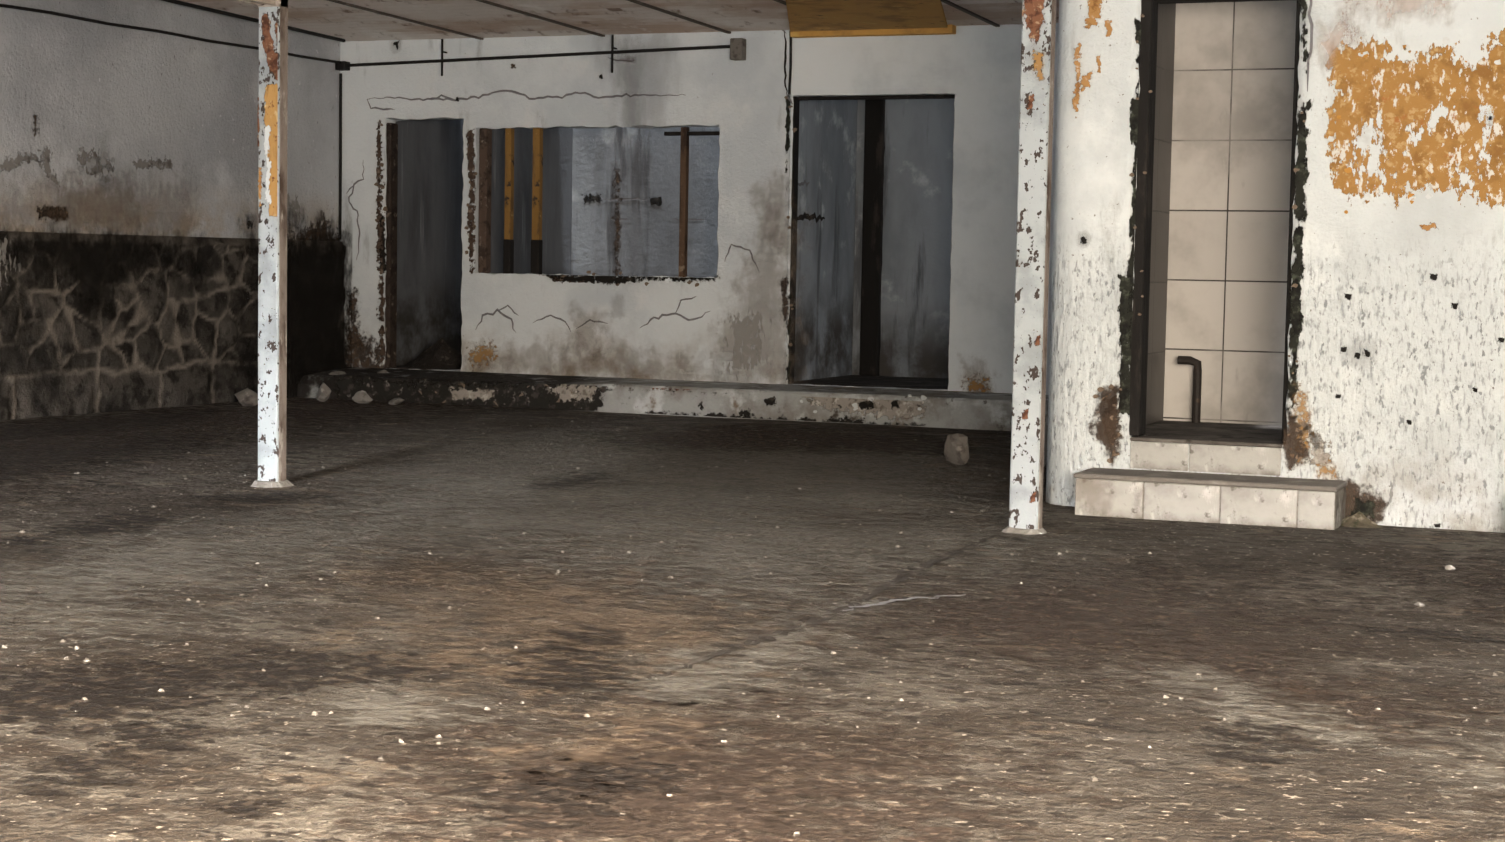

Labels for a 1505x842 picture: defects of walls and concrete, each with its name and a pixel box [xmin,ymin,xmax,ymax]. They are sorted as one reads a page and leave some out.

peeling [261,13,278,80]
crack [367,57,684,110]
corrosion [1022,0,1047,110]
peeling [1072,0,1113,118]
peeling [1307,0,1505,214]
water stain [0,228,199,317]
crack [476,296,710,332]
crack [724,244,759,271]
water stain [1117,14,1152,417]
water stain [1316,458,1389,524]
crack [631,533,1003,685]